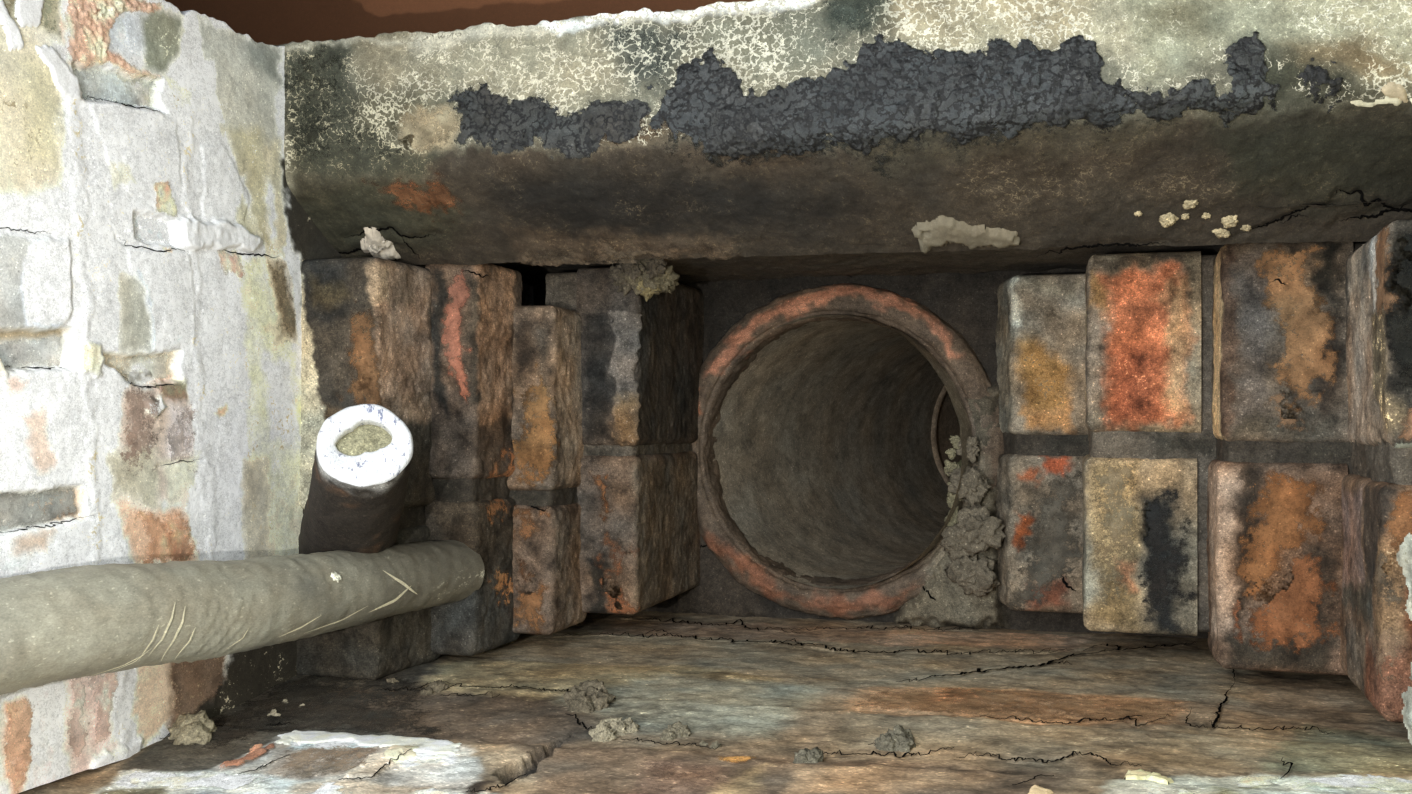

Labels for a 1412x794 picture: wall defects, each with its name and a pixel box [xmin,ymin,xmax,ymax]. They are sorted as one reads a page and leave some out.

damp [825,0,891,34]
damp [604,22,679,84]
rust [362,172,461,222]
crack [1238,189,1412,234]
rust [1254,245,1337,432]
rust [1233,472,1341,653]
crack [563,586,1197,682]
crack [823,669,1335,785]
crack [466,774,526,792]